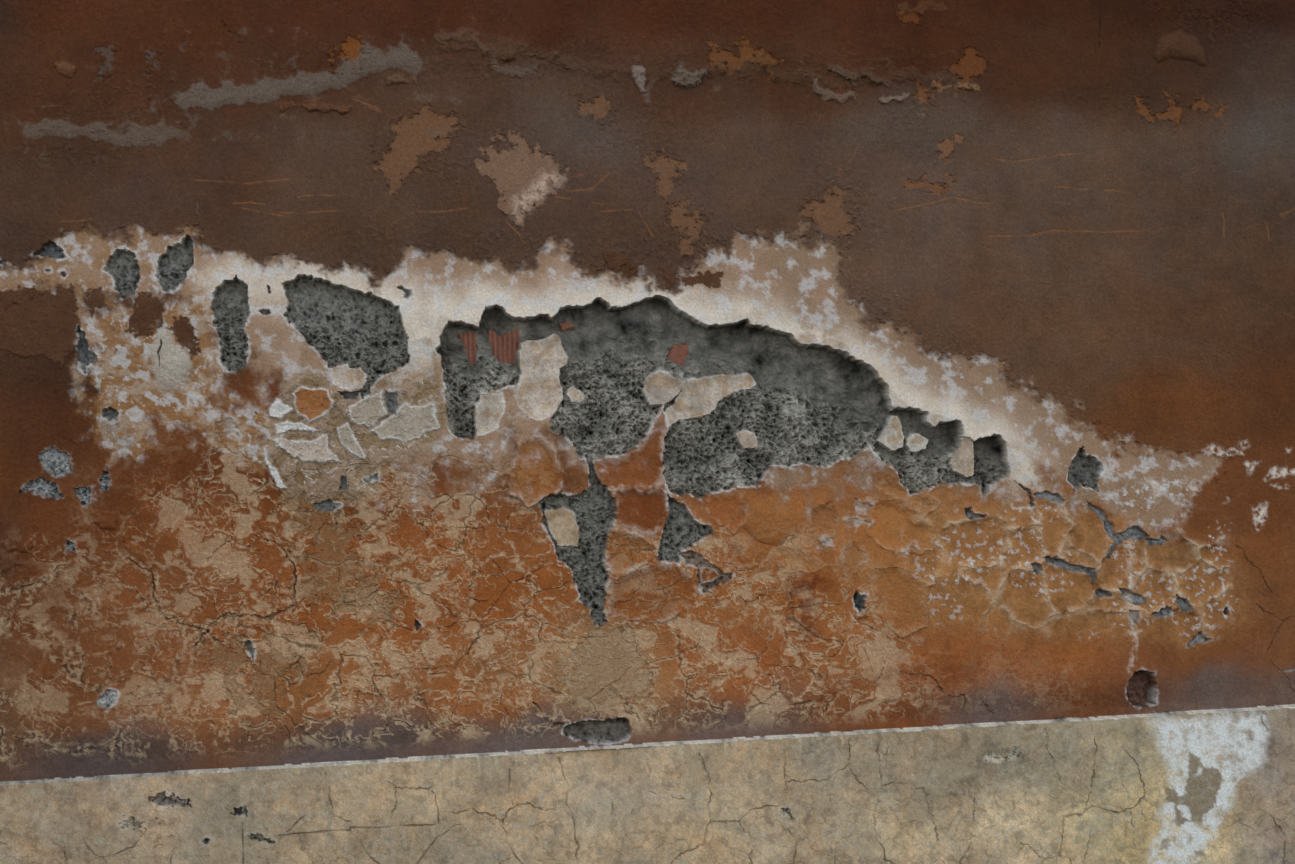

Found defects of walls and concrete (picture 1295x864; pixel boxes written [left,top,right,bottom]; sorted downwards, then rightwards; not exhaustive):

peeling [373,106,460,196]
peeling [475,130,568,224]
peeling [0,185,1223,633]
damp [1202,441,1295,490]
damp [1252,501,1269,528]
crack [256,551,547,864]
spalling [563,717,632,744]
spalling [1126,670,1157,709]
crack [502,769,580,864]
crack [672,739,893,864]
crack [1020,737,1147,864]
damp [1129,708,1273,864]